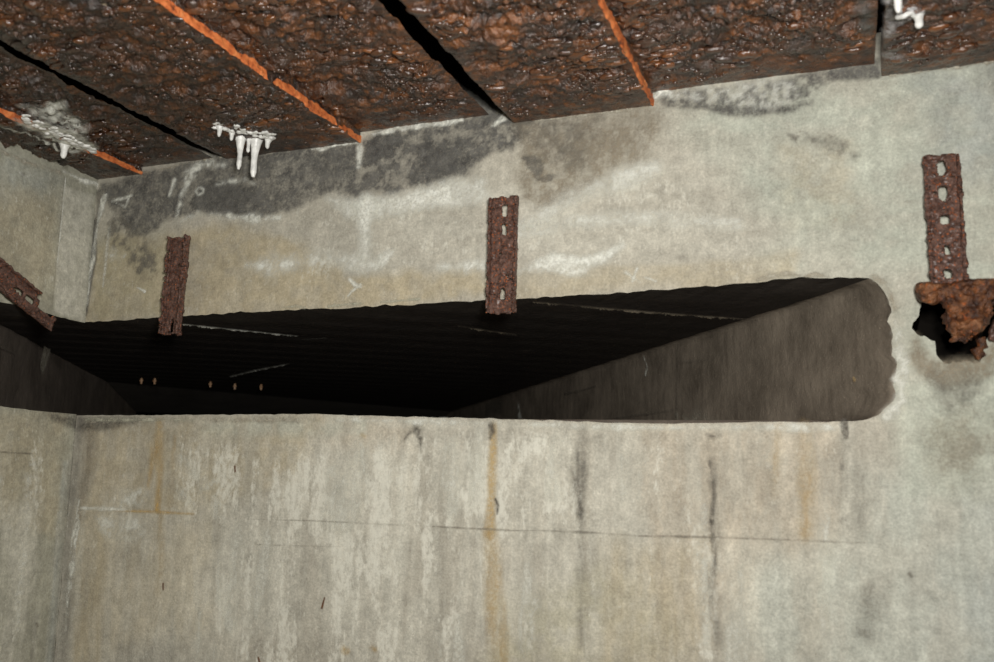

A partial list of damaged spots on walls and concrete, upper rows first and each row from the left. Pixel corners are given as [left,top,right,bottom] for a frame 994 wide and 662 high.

corrosion [0,73,49,127]
leakage [2,101,97,159]
corrosion [0,0,127,78]
corrosion [21,118,159,174]
corrosion [98,0,370,143]
corrosion [514,0,762,106]
leakage [664,53,898,115]
leakage [885,0,927,38]
corrosion [884,5,994,63]
leakage [86,77,659,312]
spalling [912,302,994,364]
corrosion [971,319,994,360]